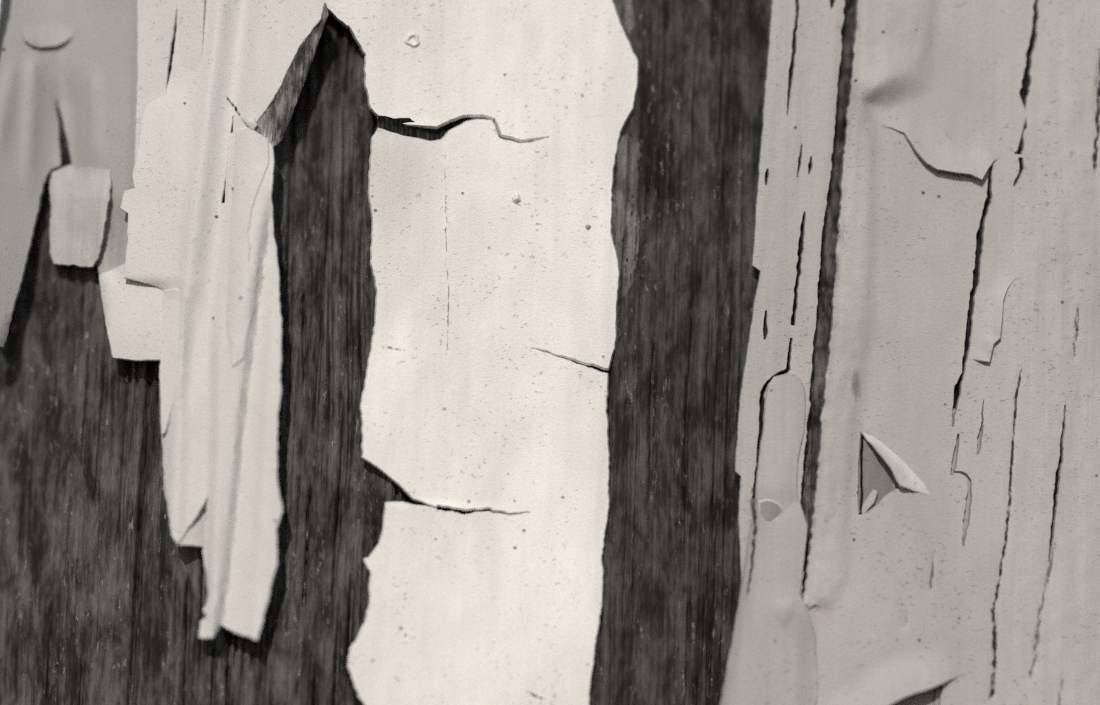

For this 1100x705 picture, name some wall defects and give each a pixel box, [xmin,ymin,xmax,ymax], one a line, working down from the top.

spalling [0,0,405,705]
crack [346,673,363,705]
crack [375,115,532,143]
crack [413,501,505,514]
spalling [571,0,978,705]
crack [953,0,1037,409]